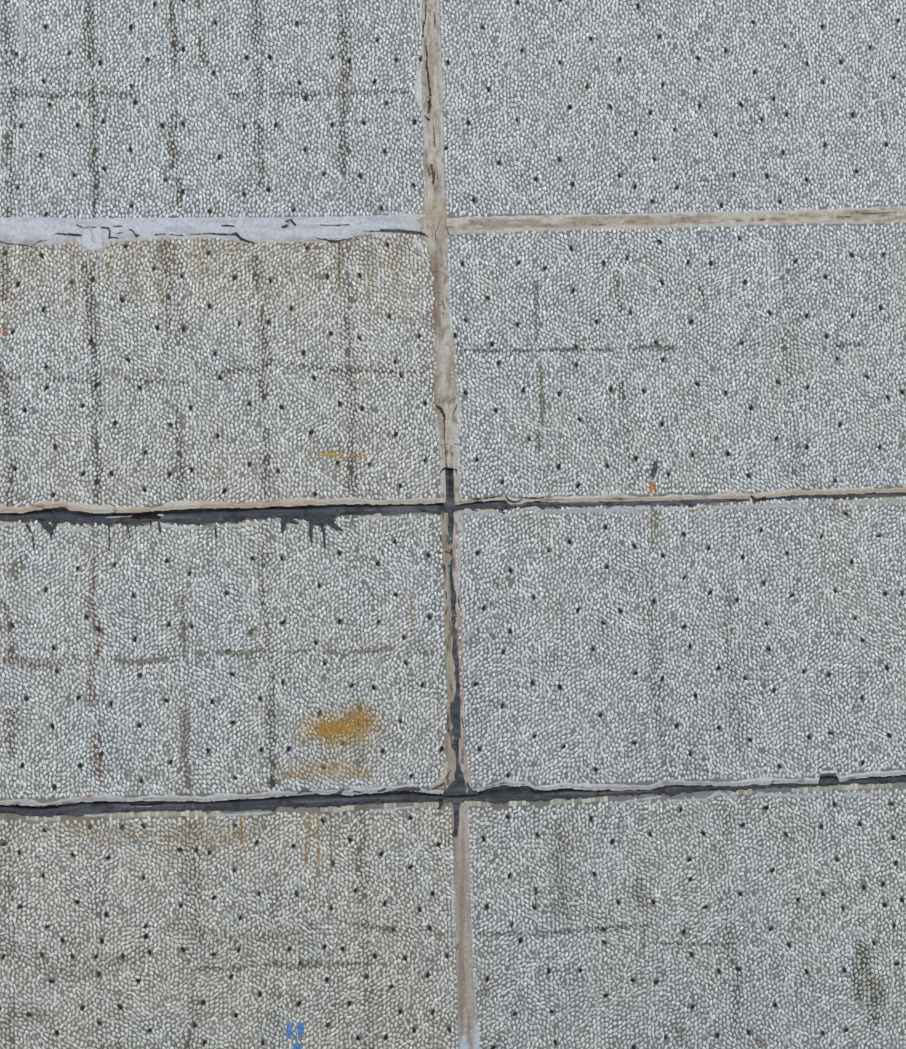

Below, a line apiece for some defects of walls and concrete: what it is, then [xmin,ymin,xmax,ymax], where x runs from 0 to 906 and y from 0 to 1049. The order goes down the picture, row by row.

crack [0,224,255,247]
crack [299,224,384,248]
rust [316,708,368,743]
rust [305,812,333,871]